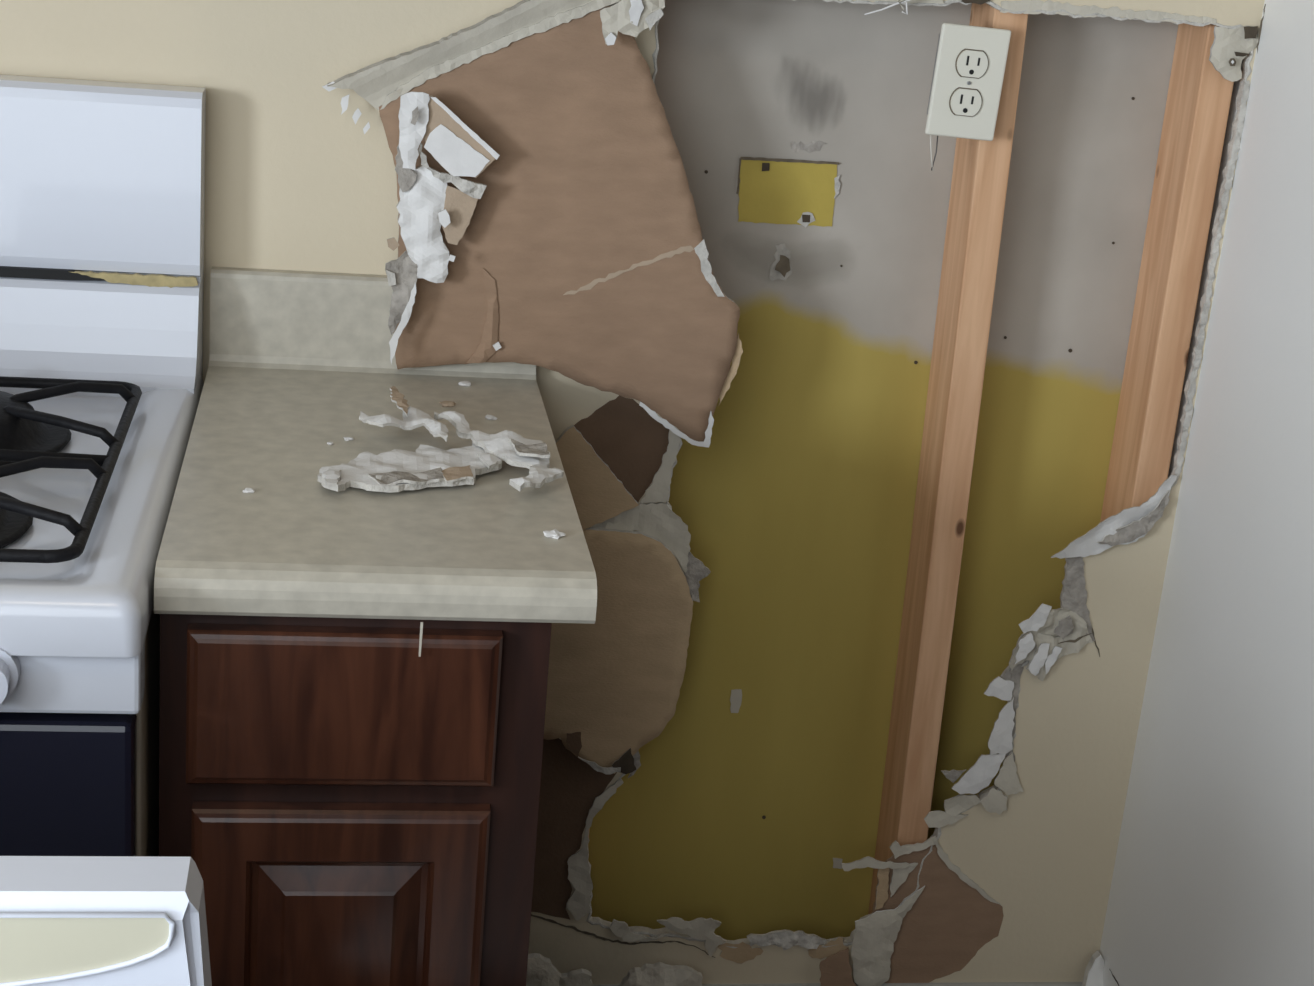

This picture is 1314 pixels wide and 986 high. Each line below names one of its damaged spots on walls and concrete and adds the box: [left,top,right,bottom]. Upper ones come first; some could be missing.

peeling [438,209,451,228]
spalling [380,0,620,110]
spalling [531,0,1004,986]
spalling [931,0,1260,812]